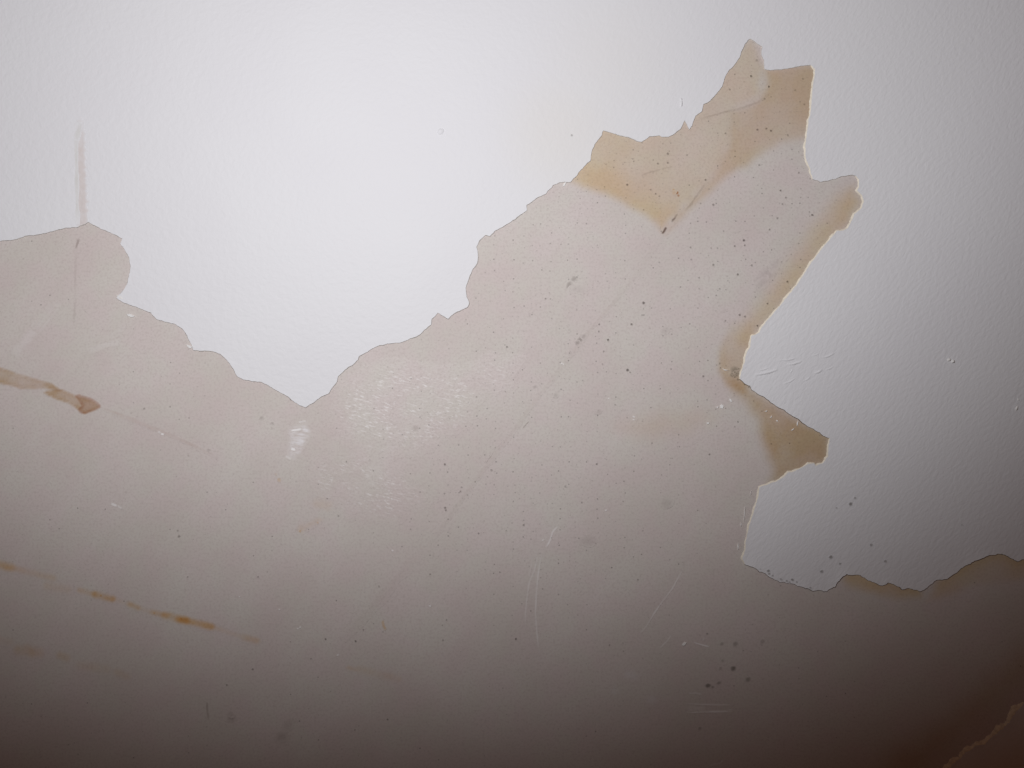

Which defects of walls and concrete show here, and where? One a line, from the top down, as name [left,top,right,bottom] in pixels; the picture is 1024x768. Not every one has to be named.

damp [566,40,813,239]
peeling [739,176,864,430]
damp [819,554,1024,605]